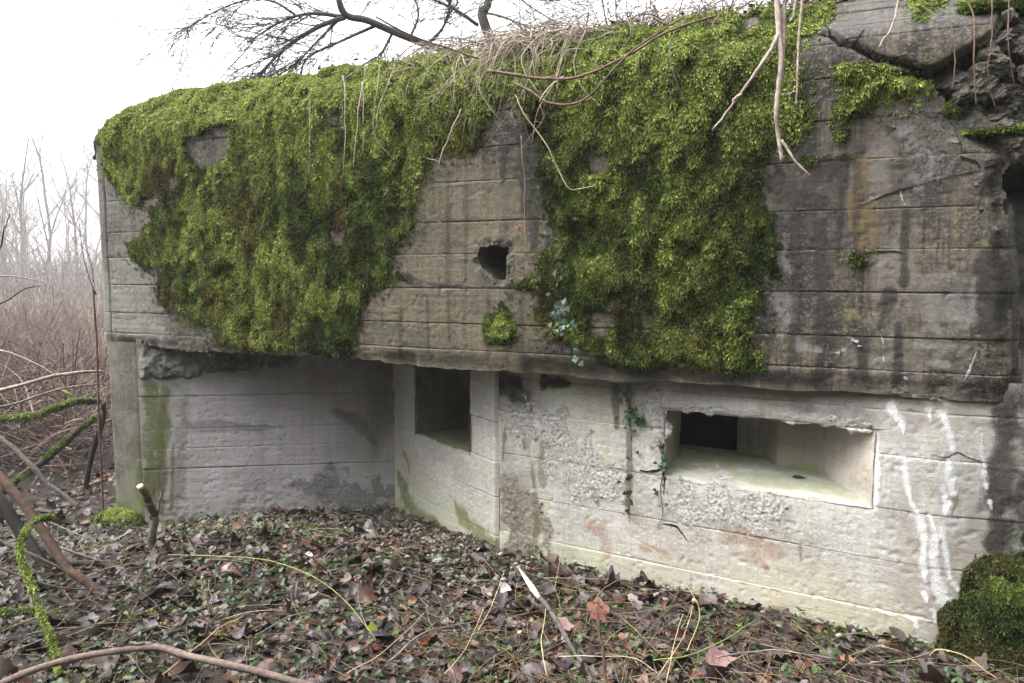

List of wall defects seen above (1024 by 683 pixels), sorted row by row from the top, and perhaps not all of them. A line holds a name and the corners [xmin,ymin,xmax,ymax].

crack [859,129,1005,207]
spalling [473,239,514,288]
damp [655,149,865,386]
damp [868,191,910,387]
spalling [135,340,308,380]
damp [844,328,869,382]
damp [156,386,171,463]
damp [454,487,541,557]
spalling [504,390,627,504]
damp [886,401,960,623]
damp [978,404,1019,555]